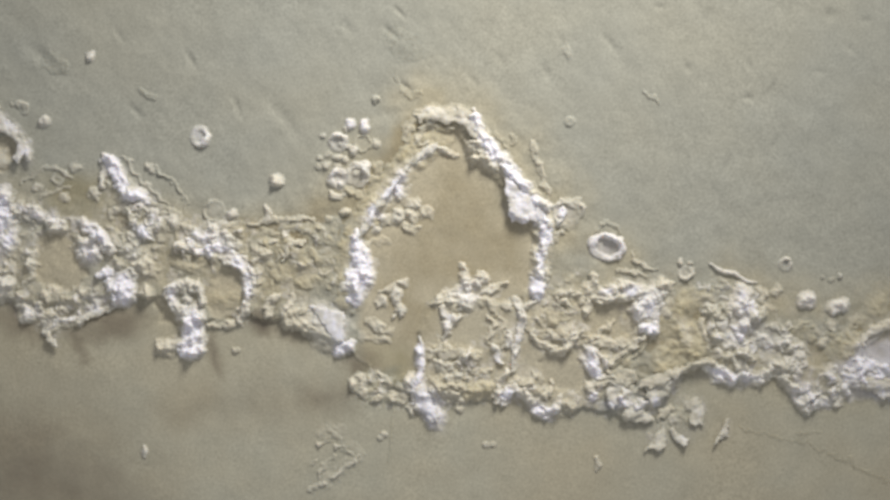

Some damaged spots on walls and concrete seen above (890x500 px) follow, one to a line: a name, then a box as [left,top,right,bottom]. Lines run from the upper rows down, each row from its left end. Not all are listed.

flaking render [0,98,890,454]
efflorescence [402,335,450,432]
efflorescence [839,336,890,409]